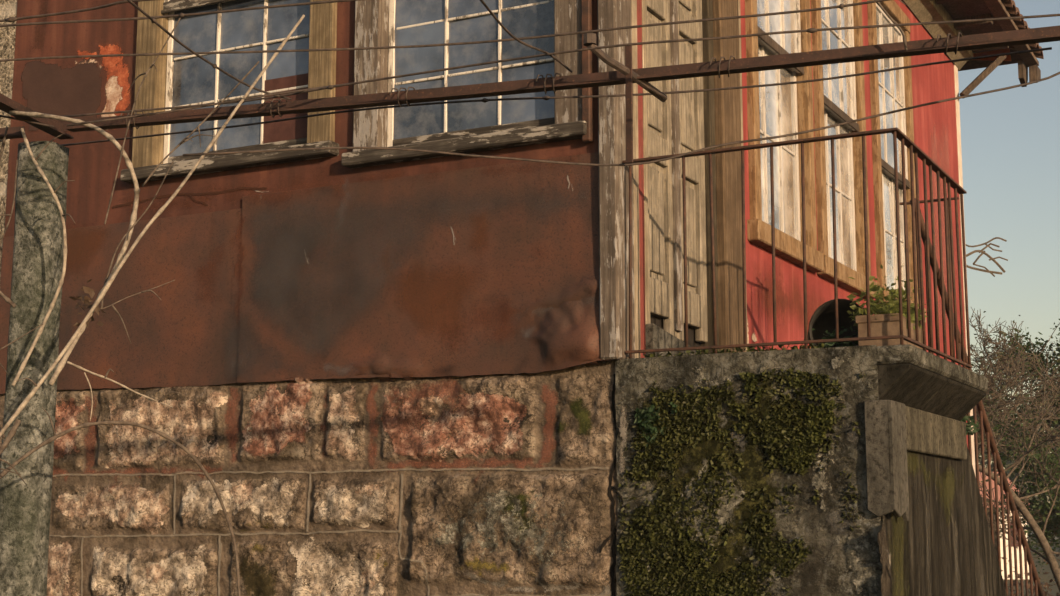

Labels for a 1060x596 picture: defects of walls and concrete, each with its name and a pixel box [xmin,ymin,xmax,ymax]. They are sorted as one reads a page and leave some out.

peeling [75,44,130,117]
crack [599,374,625,596]